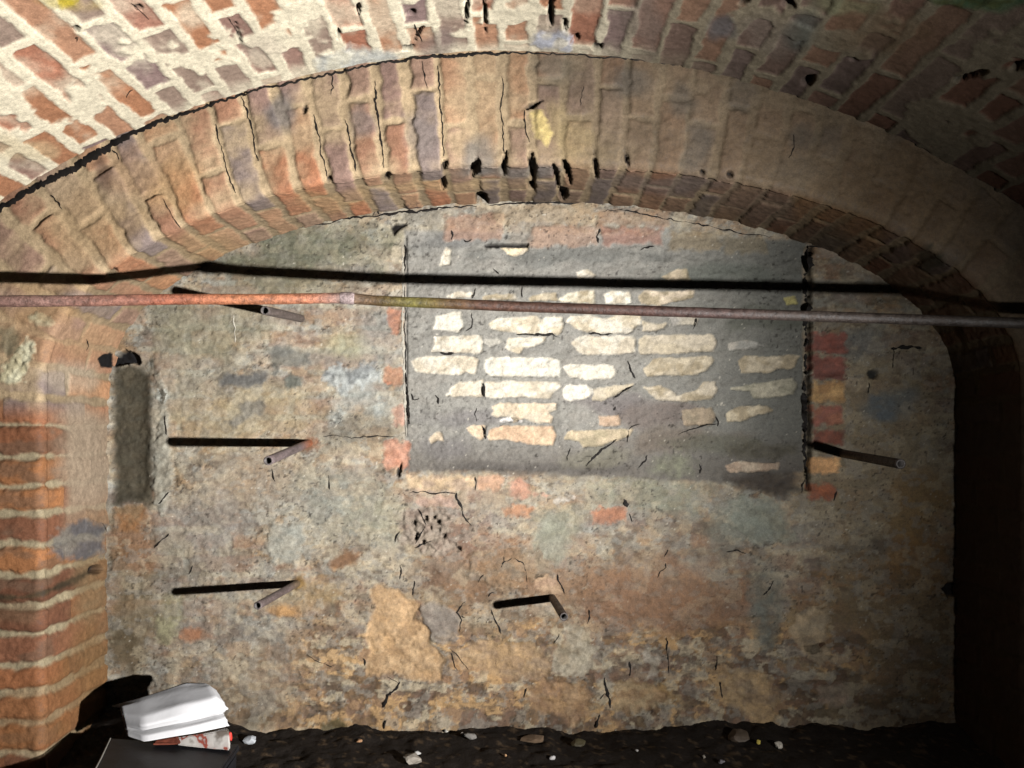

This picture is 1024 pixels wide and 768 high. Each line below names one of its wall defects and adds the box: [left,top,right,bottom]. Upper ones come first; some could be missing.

crack [0,24,674,213]
flaking render [389,223,409,269]
flaking render [439,247,452,267]
spalling [483,242,530,257]
spalling [97,349,142,369]
crack [325,245,439,439]
crack [567,362,647,466]
flaking render [382,268,850,503]
crack [801,246,821,493]
crack [395,477,477,595]
flaking render [363,582,600,730]